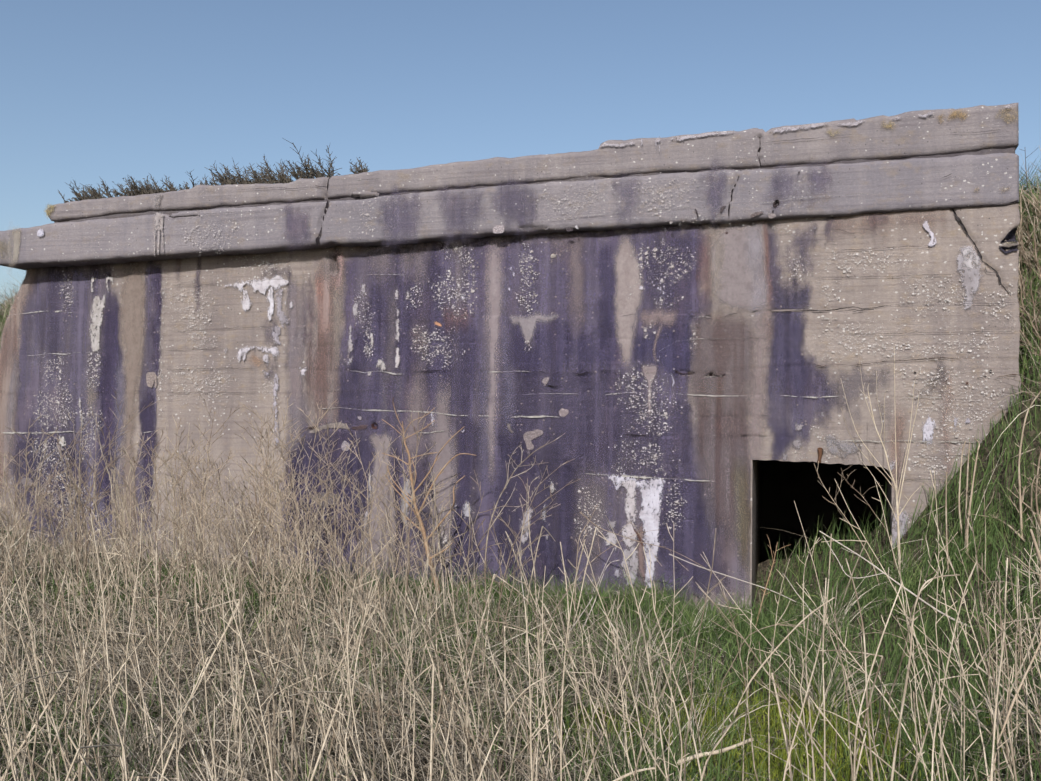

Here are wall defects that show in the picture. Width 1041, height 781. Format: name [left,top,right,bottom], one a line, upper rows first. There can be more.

crack [243,178,330,246]
crack [728,134,851,216]
crack [688,200,1018,335]
water stain [8,194,164,543]
water stain [224,177,870,600]
crack [817,331,1015,380]